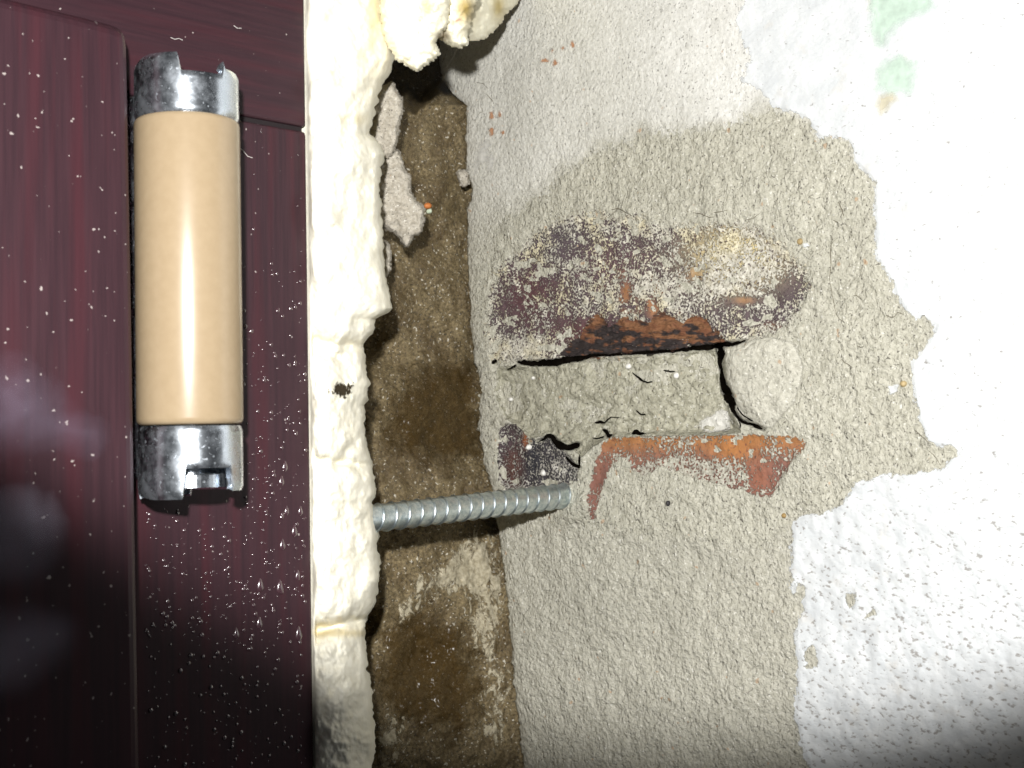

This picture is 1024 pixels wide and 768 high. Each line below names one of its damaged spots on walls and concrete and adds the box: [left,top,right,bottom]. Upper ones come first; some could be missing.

water stain [383,365,479,459]
crack [539,410,646,468]
crack [491,340,763,430]
peeling [473,0,1024,768]
water stain [376,614,511,749]